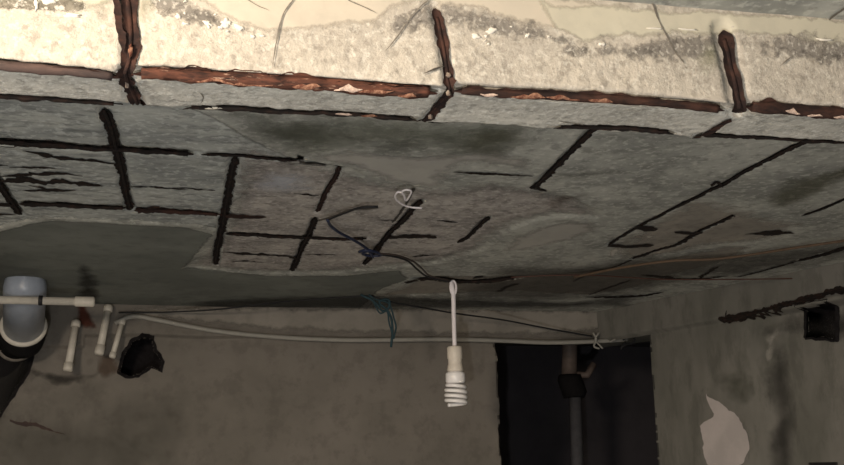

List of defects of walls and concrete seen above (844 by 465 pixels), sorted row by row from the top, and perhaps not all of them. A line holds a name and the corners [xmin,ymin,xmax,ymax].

crack [248,0,293,66]
water stain [265,128,508,144]
spalling [0,0,844,295]
peeling [700,394,749,465]